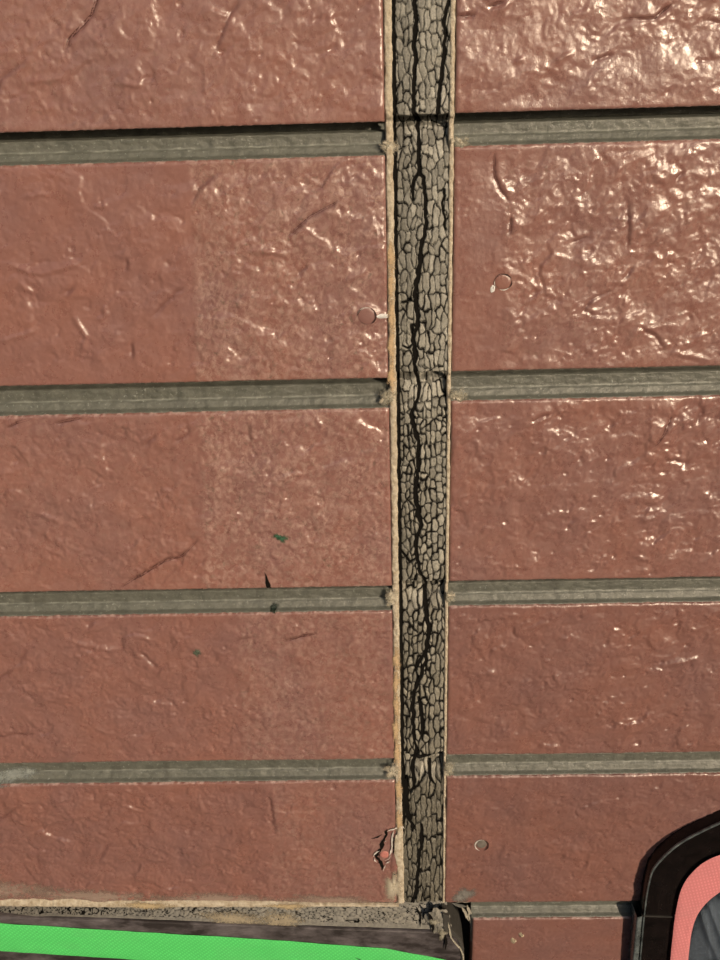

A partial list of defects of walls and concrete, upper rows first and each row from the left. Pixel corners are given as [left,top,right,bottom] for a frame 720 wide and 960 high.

crack [0,0,503,949]
peeling [372,826,404,902]